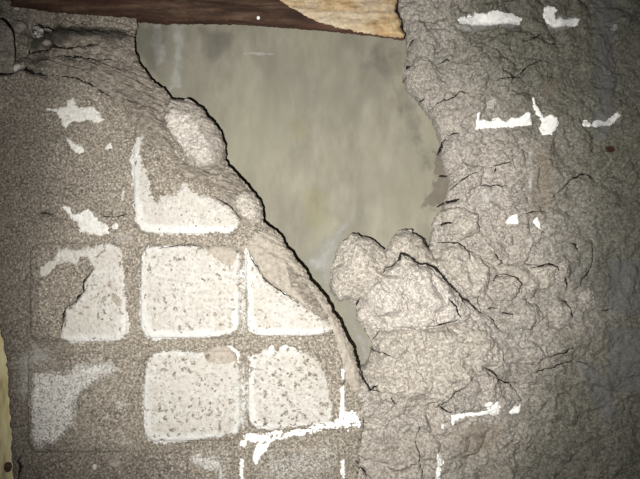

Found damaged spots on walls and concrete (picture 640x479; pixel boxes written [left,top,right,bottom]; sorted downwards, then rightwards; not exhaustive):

peeling [458,10,522,26]
peeling [543,6,580,28]
crack [0,43,118,76]
spalling [21,26,249,236]
peeling [475,97,559,135]
crack [437,162,510,207]
crack [61,269,93,329]
crack [249,251,299,303]
crack [383,238,523,333]
crack [532,241,593,318]
peeling [138,230,362,465]
peeling [441,401,501,429]